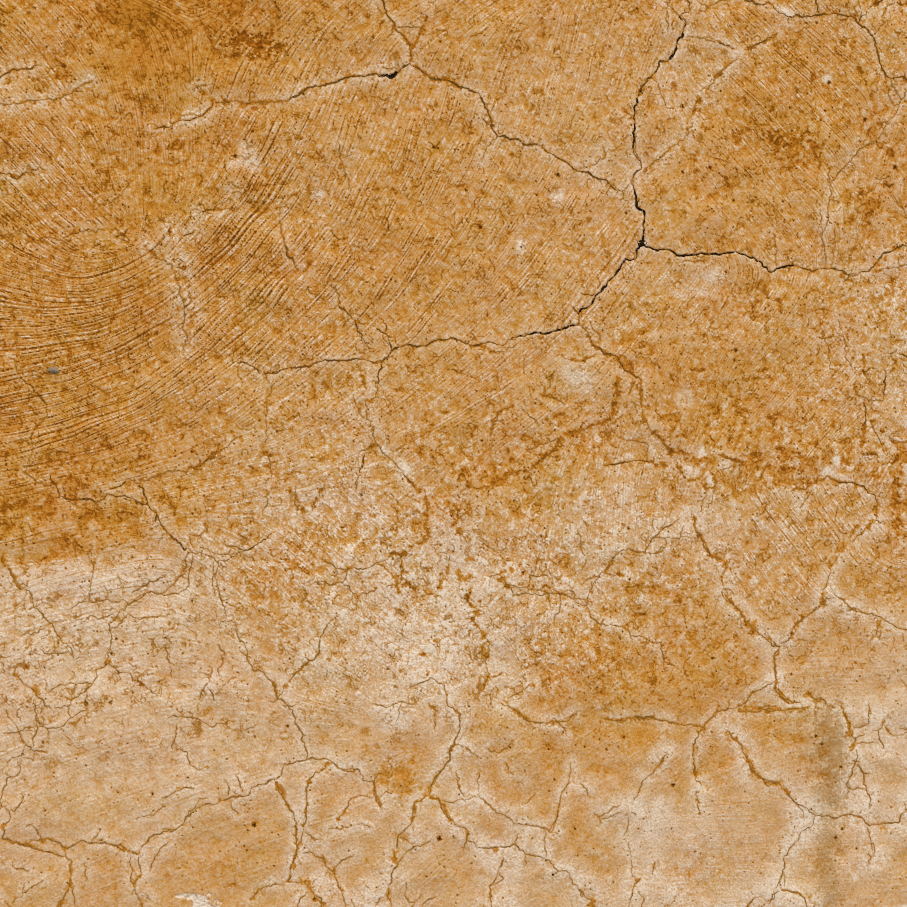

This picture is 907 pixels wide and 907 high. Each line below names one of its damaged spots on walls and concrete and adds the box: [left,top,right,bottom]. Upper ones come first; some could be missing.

crack [0,46,107,123]
crack [0,161,248,369]
crack [316,133,367,261]
crack [815,314,907,466]
crack [0,422,314,907]
crack [453,565,493,664]
crack [234,741,400,907]
crack [388,865,451,907]
crack [442,735,458,770]
crack [450,826,539,907]
crack [522,765,693,907]
crack [817,686,907,893]